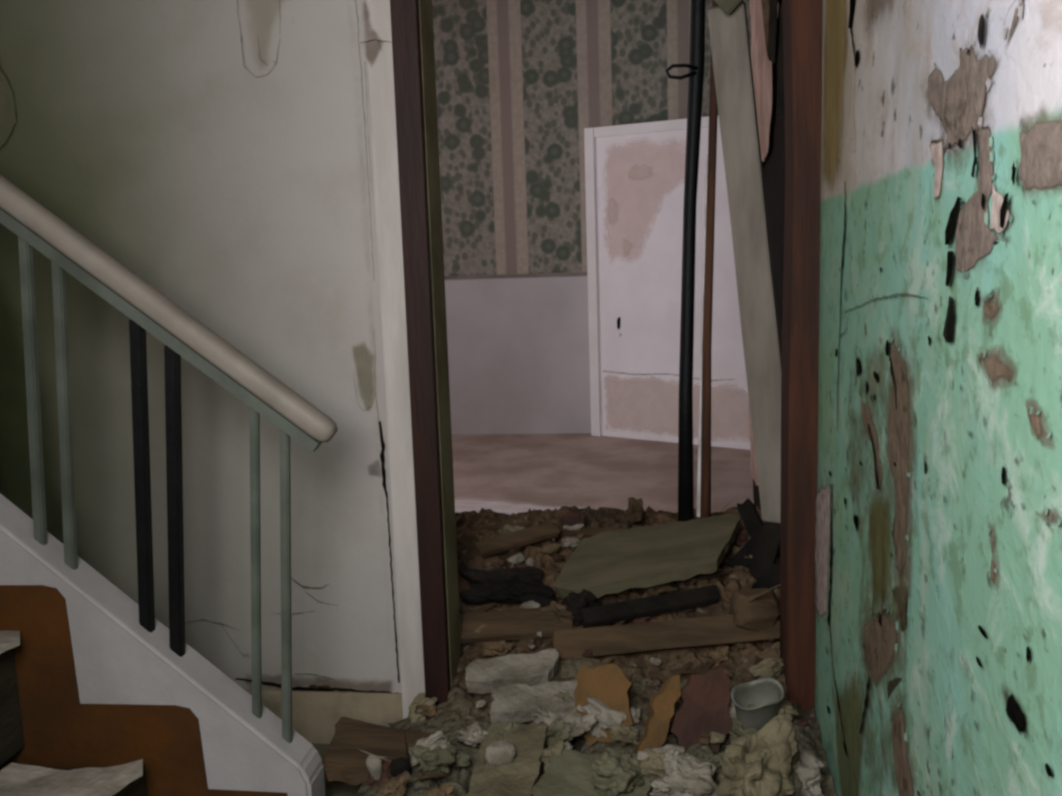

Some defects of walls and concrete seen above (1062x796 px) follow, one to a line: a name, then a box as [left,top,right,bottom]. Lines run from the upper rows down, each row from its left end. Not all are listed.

peeling [1001,0,1023,44]
peeling [606,144,686,257]
peeling [926,14,1062,343]
peeling [603,371,679,435]
peeling [693,378,750,439]
peeling [847,335,927,594]
peeling [977,349,1016,387]
crack [186,421,400,693]
peeling [859,608,899,734]
peeling [890,703,928,796]